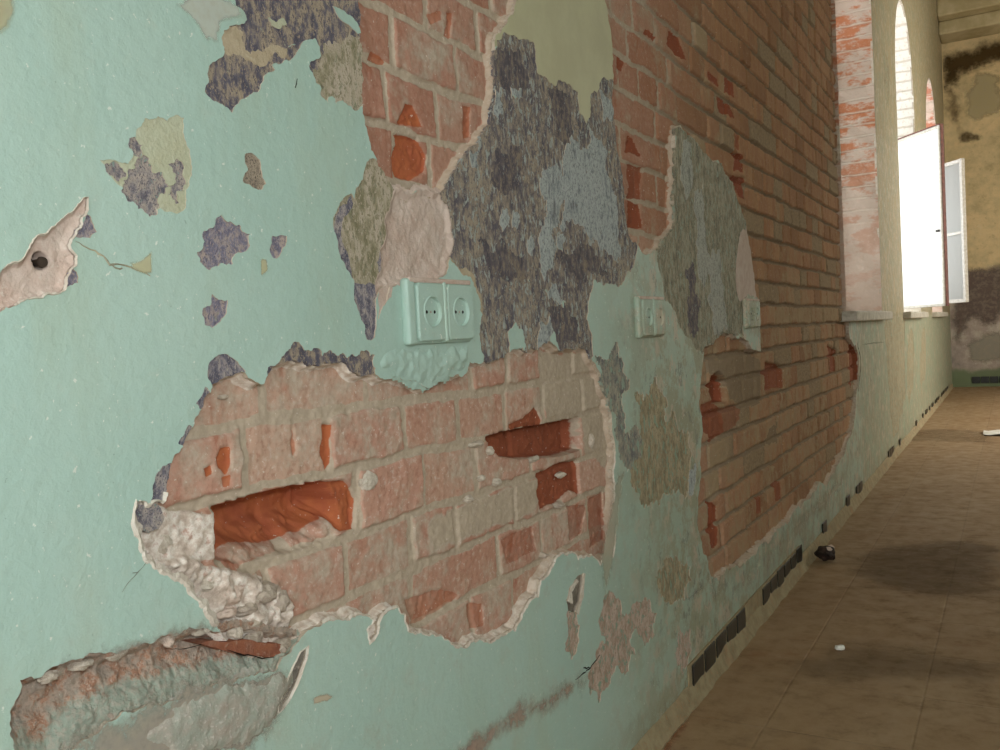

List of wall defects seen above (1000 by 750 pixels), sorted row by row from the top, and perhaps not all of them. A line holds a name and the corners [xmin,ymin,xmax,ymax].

leakage [943,43,1000,120]
peeling [100,115,192,216]
leakage [959,132,979,142]
flaking render [0,197,95,310]
flaking render [130,0,858,659]
leakage [953,267,1000,361]